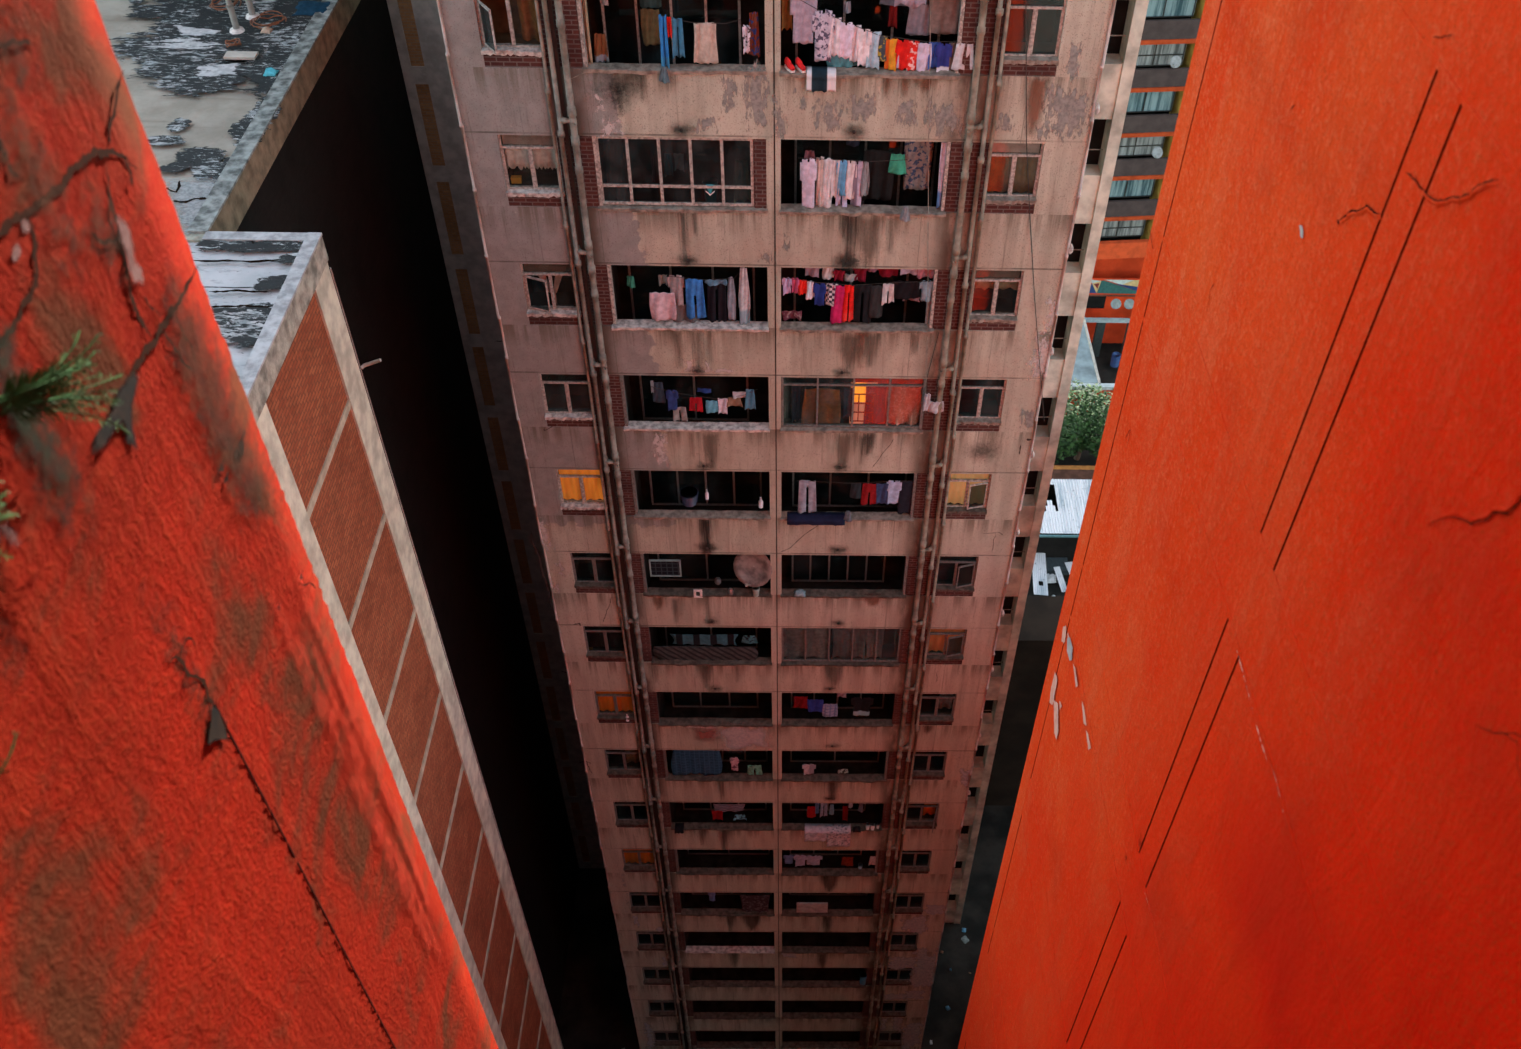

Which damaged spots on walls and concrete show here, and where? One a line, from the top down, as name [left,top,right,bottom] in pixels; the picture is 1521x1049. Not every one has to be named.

peeling [1036,41,1098,140]
crack [1336,204,1381,226]
crack [1405,172,1501,208]
crack [0,70,280,448]
crack [1427,494,1521,525]
crack [168,636,214,706]
peeling [1049,626,1091,750]